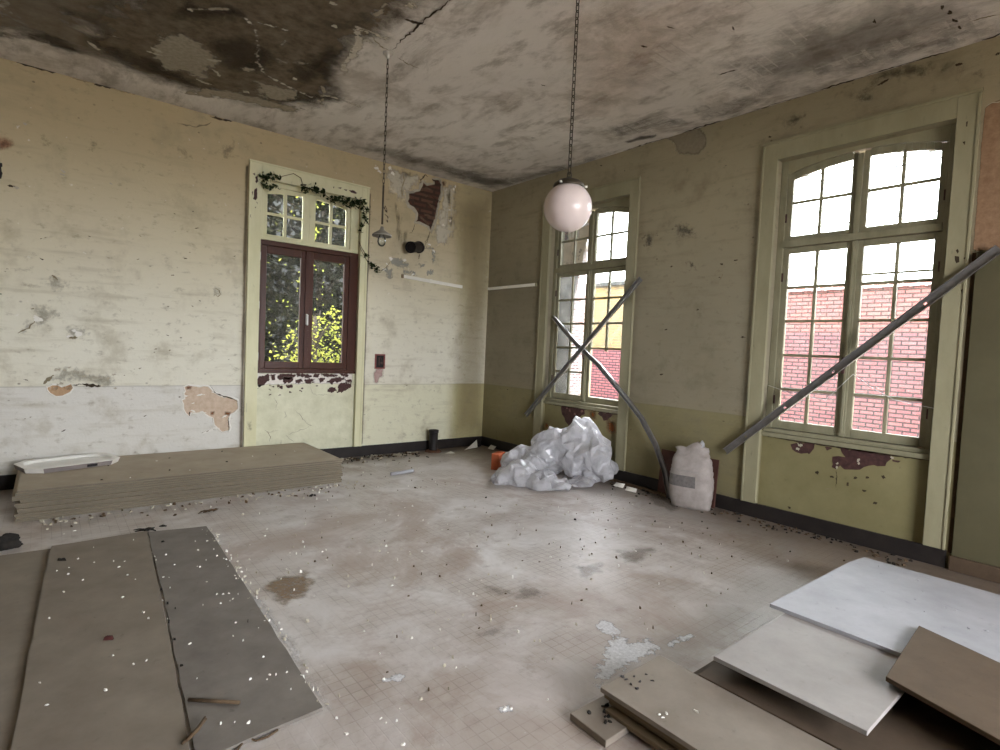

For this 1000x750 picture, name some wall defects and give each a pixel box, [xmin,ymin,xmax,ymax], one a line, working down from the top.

damp [0,0,408,105]
crack [373,0,450,68]
flaking render [374,166,456,253]
flaking render [43,367,117,398]
flaking render [181,384,239,434]
peeling [257,373,352,396]
peeling [561,406,617,433]
peeling [790,442,900,470]